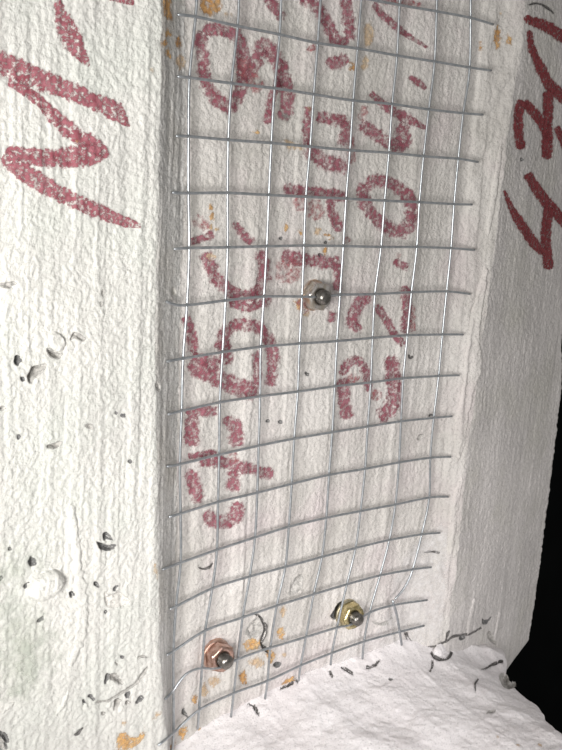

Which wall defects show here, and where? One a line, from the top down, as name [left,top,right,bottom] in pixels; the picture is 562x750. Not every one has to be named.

rust [243,638,286,668]
rust [116,732,145,750]